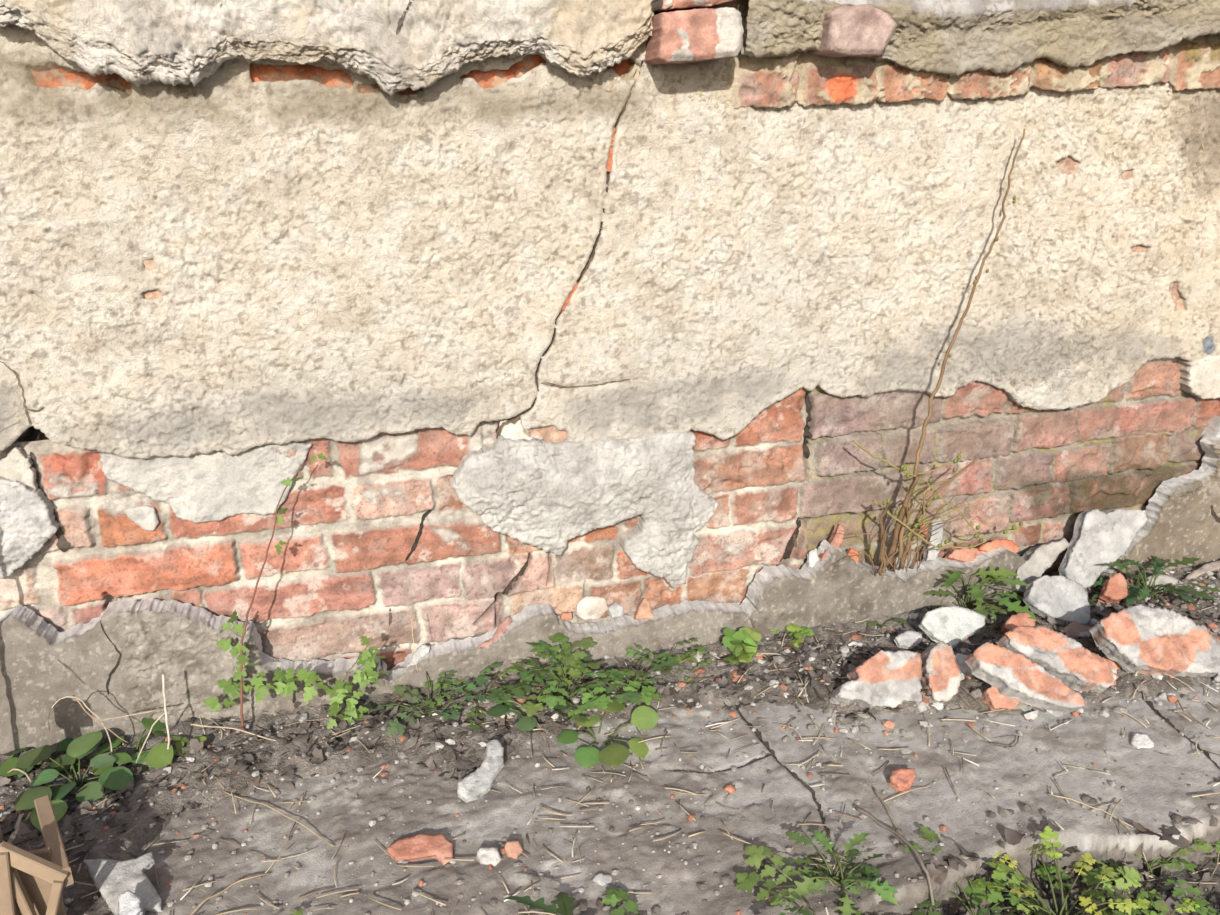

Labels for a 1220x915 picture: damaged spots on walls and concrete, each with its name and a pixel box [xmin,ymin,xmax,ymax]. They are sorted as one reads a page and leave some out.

flaking render [27,62,132,96]
flaking render [250,63,422,95]
crack [496,62,642,439]
crack [0,361,70,552]
flaking render [0,355,1220,671]
crack [501,553,530,595]
crack [57,620,121,695]